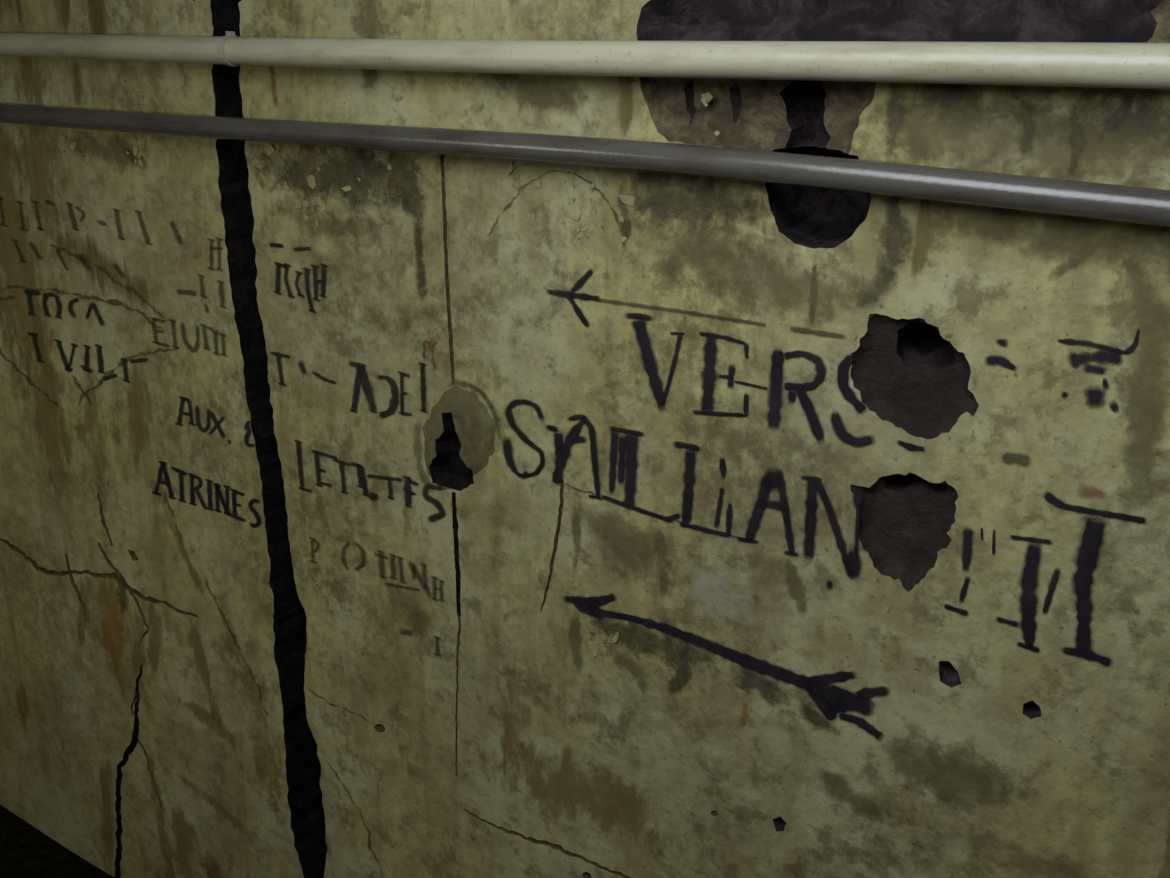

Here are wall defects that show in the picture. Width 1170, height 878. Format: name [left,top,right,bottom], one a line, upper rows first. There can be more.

crack [210,0,240,37]
flaking render [636,0,1170,43]
flaking render [639,77,876,159]
hole [765,182,871,249]
flaking render [850,314,979,440]
crack [0,64,382,878]
flaking render [850,472,958,592]